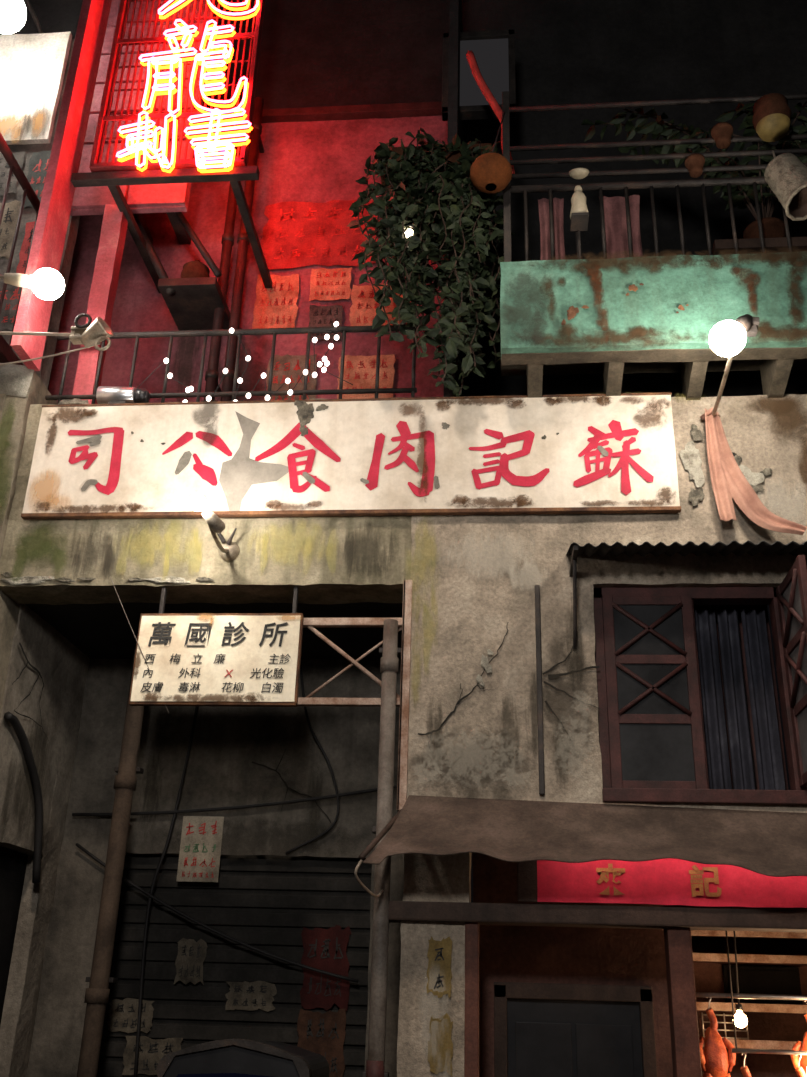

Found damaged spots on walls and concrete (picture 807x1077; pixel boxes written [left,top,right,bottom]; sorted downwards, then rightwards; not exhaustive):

corrosion [537,252,691,349]
corrosion [710,248,807,341]
peeling [679,424,705,506]
spalling [732,452,772,493]
leakage [752,398,807,483]
crack [418,623,508,750]
crack [543,646,601,746]